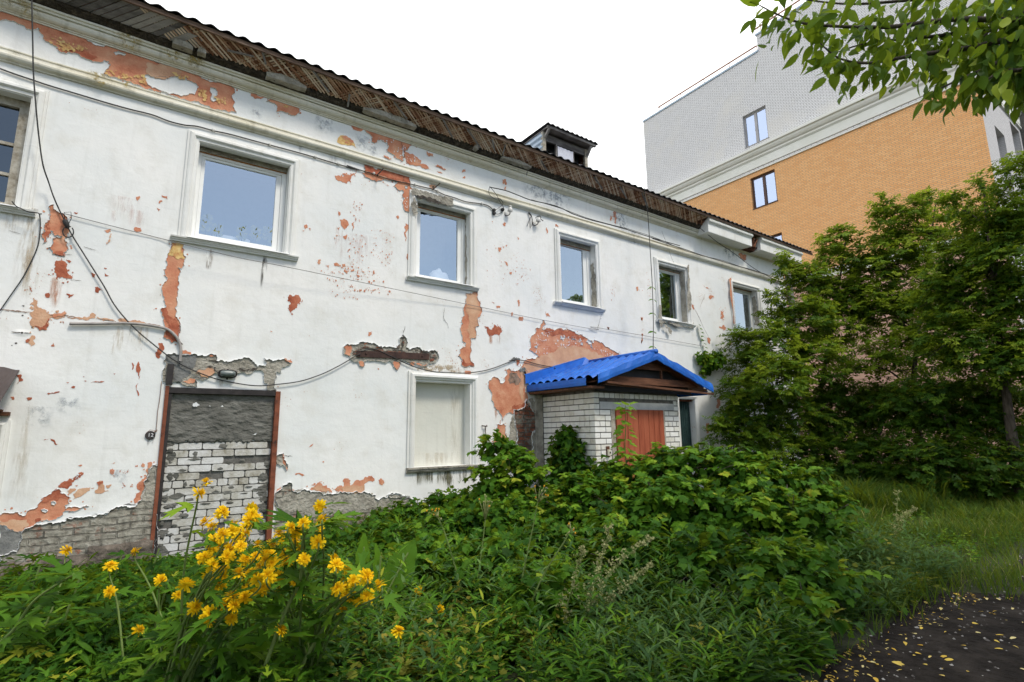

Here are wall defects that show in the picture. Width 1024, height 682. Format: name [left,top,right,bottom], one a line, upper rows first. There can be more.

peeling [0,11,238,113]
peeling [335,126,454,241]
peeling [35,204,77,298]
peeling [11,288,145,346]
spalling [155,242,292,391]
peeling [317,201,392,300]
spalling [343,332,439,370]
peeling [456,218,523,374]
peeling [488,311,621,467]
spalling [0,462,159,564]
spalling [274,452,412,538]